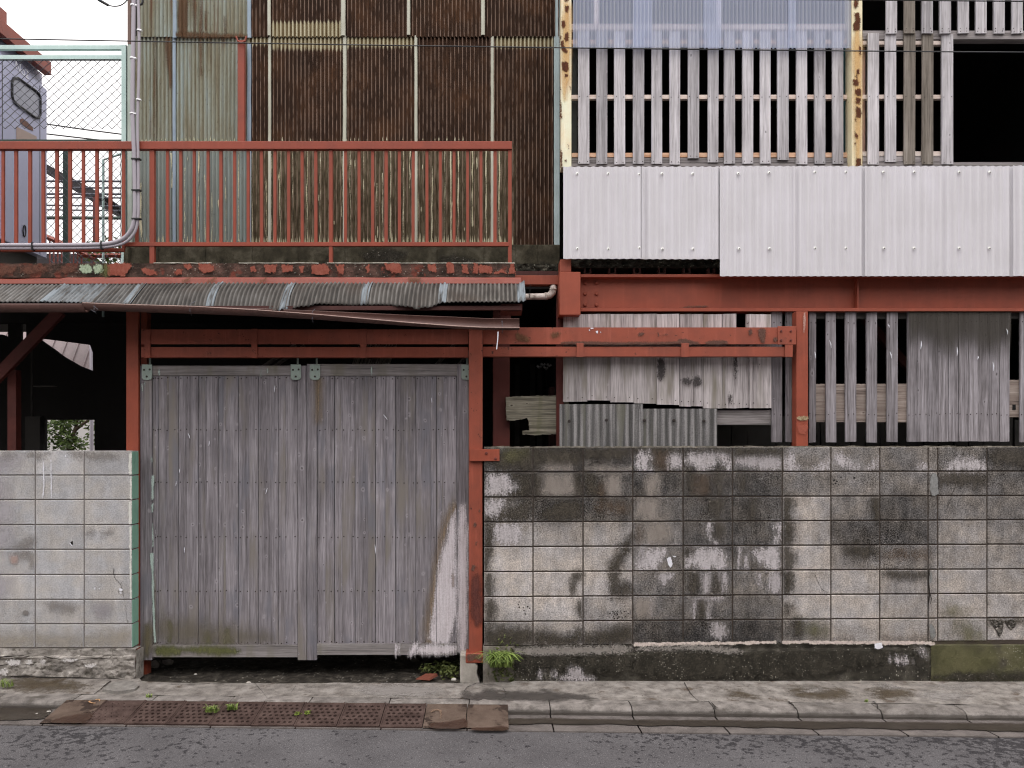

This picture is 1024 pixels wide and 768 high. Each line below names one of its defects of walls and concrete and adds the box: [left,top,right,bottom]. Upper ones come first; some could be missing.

rust [154,0,246,118]
rust [853,31,862,160]
peeling [0,264,75,276]
peeling [107,262,158,277]
peeling [174,263,215,275]
peeling [250,263,345,275]
peeling [384,262,402,274]
peeling [427,262,516,275]
water stain [940,447,1024,490]
water stain [395,504,469,657]
water stain [462,448,928,702]